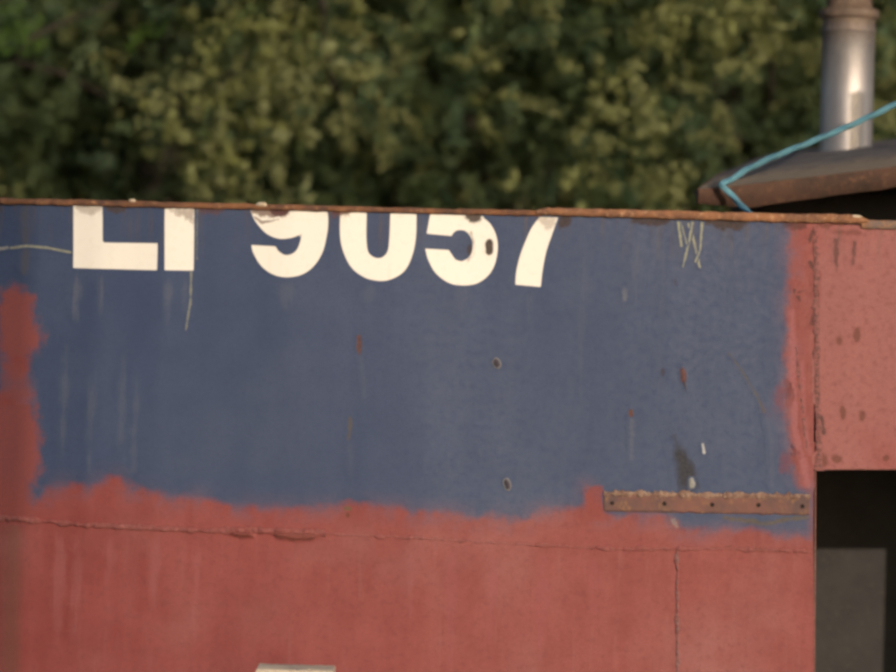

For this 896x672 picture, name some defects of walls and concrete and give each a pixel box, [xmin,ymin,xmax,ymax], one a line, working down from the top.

rust [325,211,353,223]
rust [461,214,487,227]
rust [628,218,674,231]
peeling [0,274,55,528]
peeling [581,481,608,524]